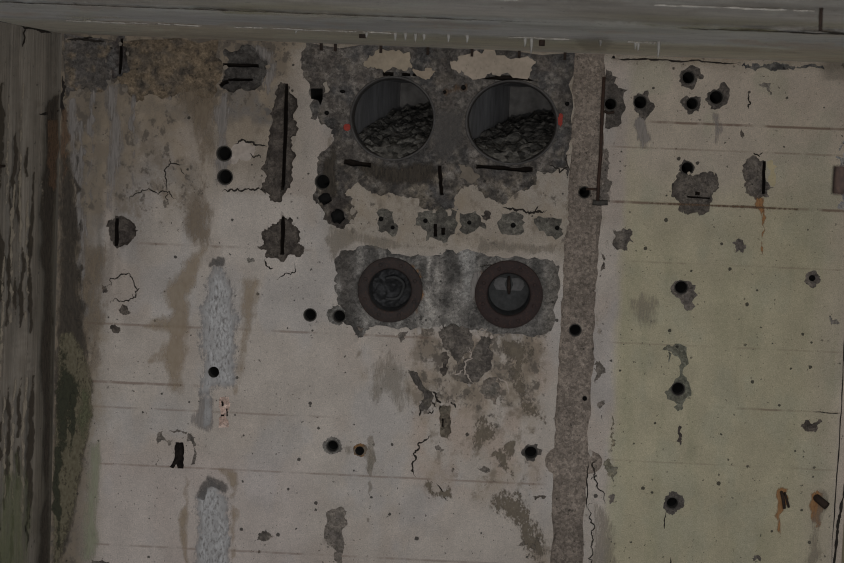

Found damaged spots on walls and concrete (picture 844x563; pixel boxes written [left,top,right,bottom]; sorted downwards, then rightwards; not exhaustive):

crack [129,160,185,202]
peeling [216,141,256,185]
spalling [257,82,304,262]
spalling [671,159,719,216]
spalling [106,216,138,249]
spalling [300,43,575,404]
corrosion [651,198,798,253]
crack [106,273,139,302]
damp [39,91,105,563]
crack [455,328,488,384]
crack [419,391,456,416]
crack [411,436,429,477]